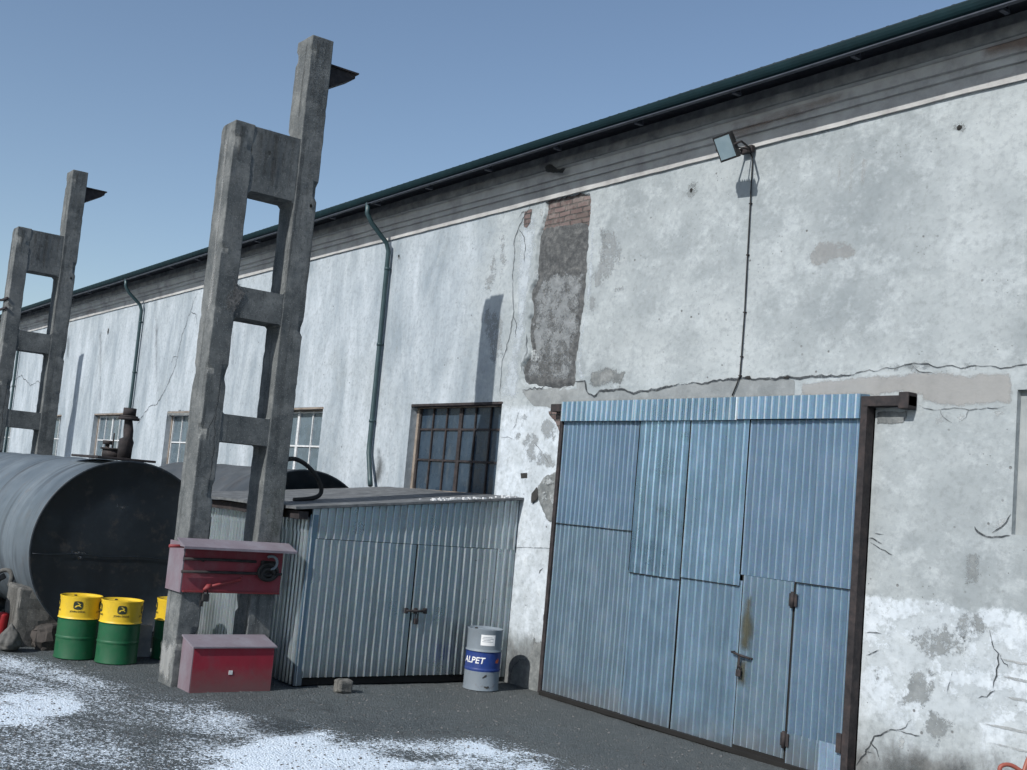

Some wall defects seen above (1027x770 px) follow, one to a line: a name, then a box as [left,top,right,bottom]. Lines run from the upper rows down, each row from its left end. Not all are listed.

crack [499,209,529,390]
spalling [484,193,851,522]
crack [816,363,1027,377]
crack [974,514,1011,538]
peeling [912,614,986,657]
crack [977,630,1008,699]
crack [857,721,919,764]
peeling [902,671,950,747]